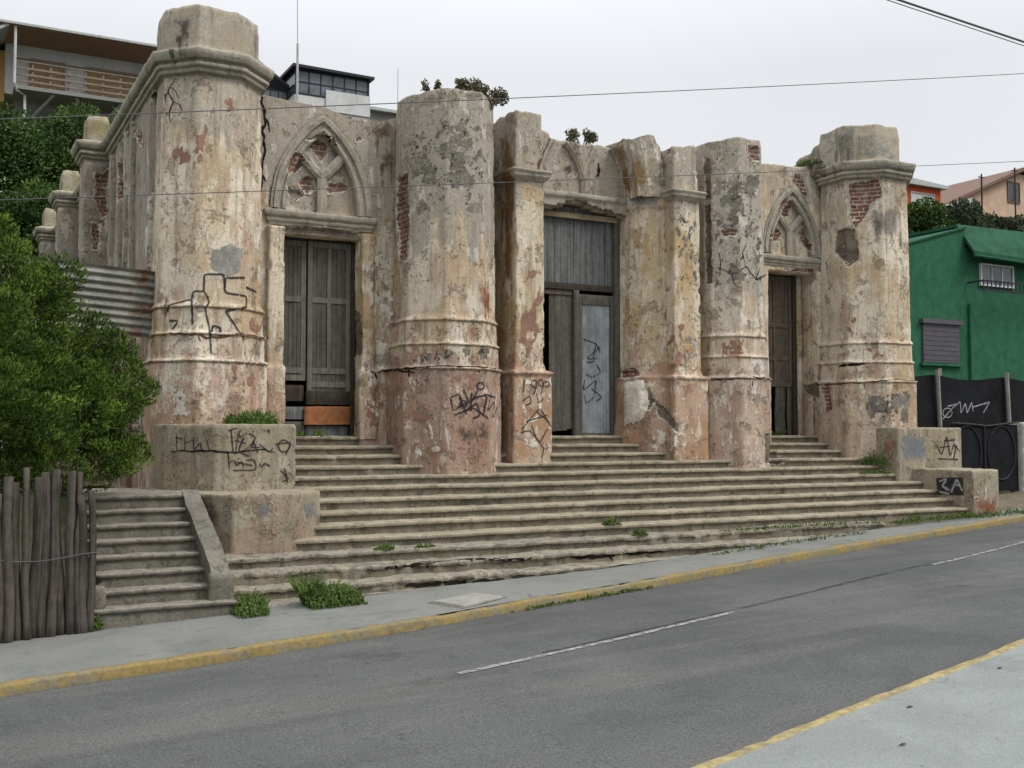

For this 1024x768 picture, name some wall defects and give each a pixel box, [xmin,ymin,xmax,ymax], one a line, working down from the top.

crack [164,80,182,122]
peeling [172,124,208,164]
crack [260,96,270,192]
flaking render [285,132,350,203]
flaking render [89,161,124,251]
flaking render [354,117,486,359]
crack [718,243,764,289]
flaking render [676,143,829,288]
flaking render [835,175,884,269]
flaking render [645,386,687,452]
flaking render [866,391,910,459]